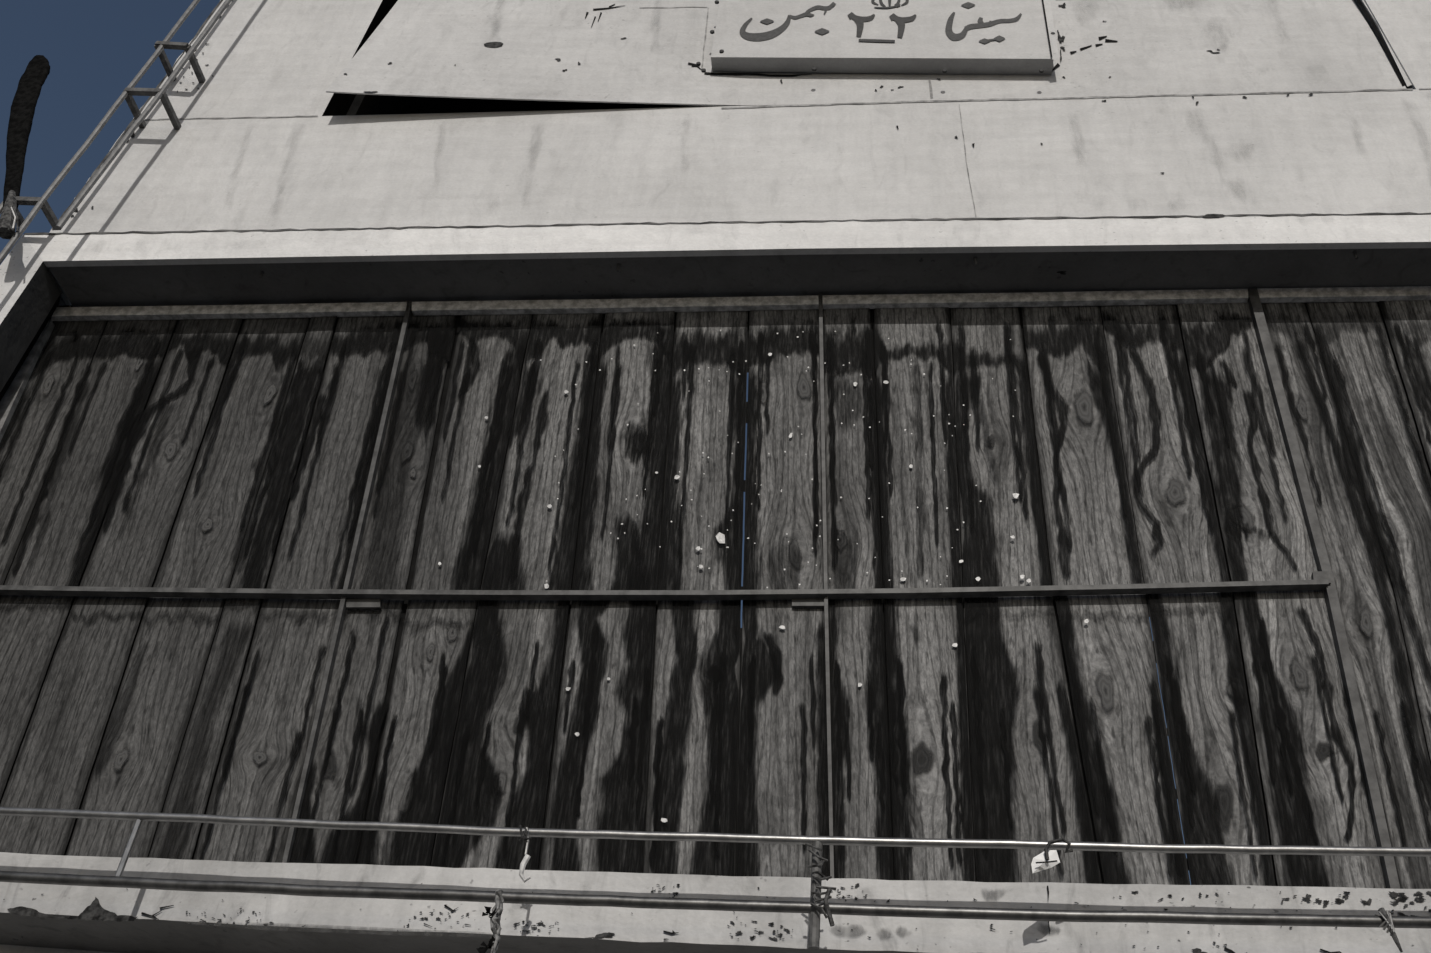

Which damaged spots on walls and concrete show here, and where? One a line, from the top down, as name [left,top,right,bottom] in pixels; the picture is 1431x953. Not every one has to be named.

water stain [0,311,1431,887]
spalling [1280,891,1372,911]
spalling [1389,891,1431,916]